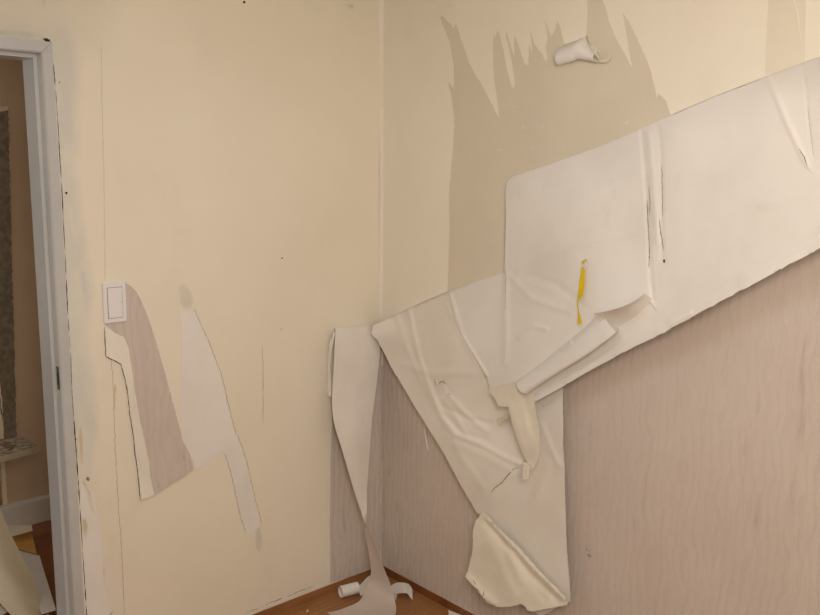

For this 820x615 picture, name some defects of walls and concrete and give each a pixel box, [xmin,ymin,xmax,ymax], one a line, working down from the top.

flaking render [0,106,17,441]
peeling [104,281,194,500]
peeling [440,0,671,291]